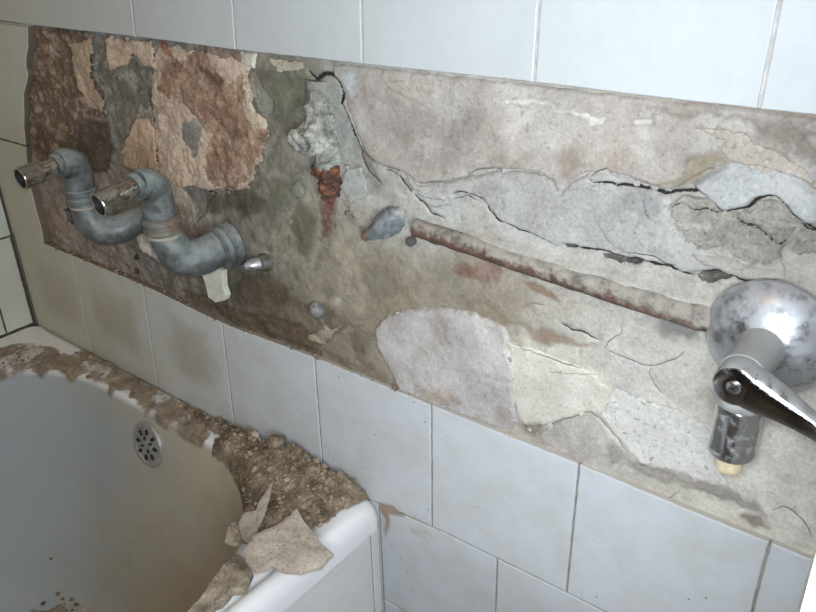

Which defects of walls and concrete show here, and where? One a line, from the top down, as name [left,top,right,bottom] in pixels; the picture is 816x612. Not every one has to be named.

flaking render [269,57,304,73]
flaking render [28,29,274,222]
flaking render [137,234,160,263]
rust [310,164,343,233]
crack [309,70,748,281]
flaking render [334,64,816,283]
crack [589,168,816,282]
rust [528,283,557,300]
flaking render [308,324,341,344]
crack [561,323,684,395]
flaking render [376,307,728,494]